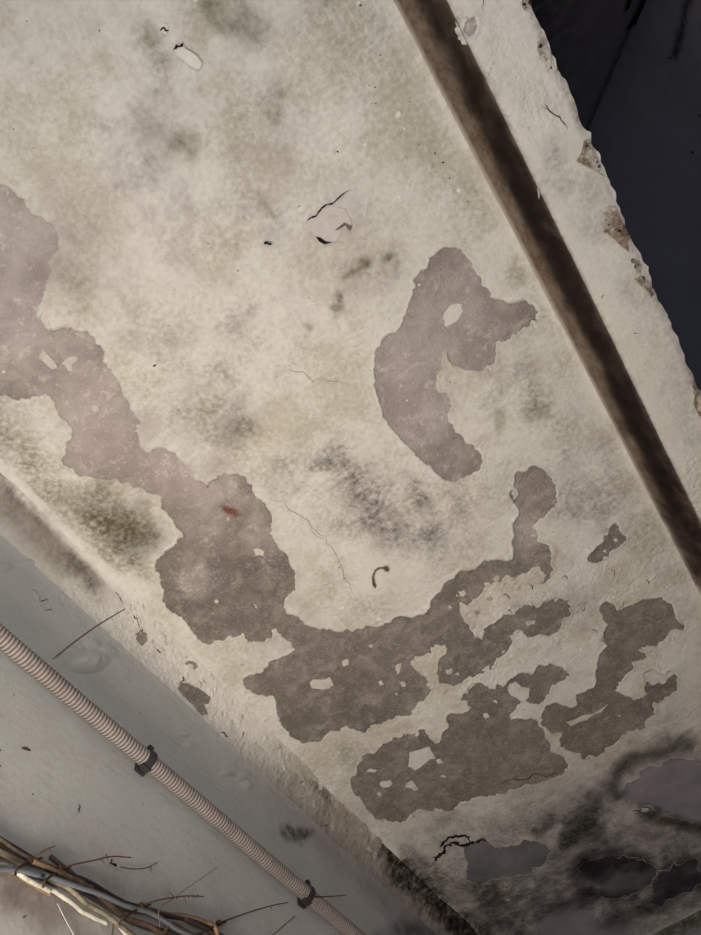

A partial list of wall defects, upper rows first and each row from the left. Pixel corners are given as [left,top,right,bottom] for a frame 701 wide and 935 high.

spalling [537,41,557,74]
peeling [455,7,548,198]
spalling [576,140,604,176]
peeling [0,175,701,861]
crack [432,835,488,862]
leakage [387,850,489,935]